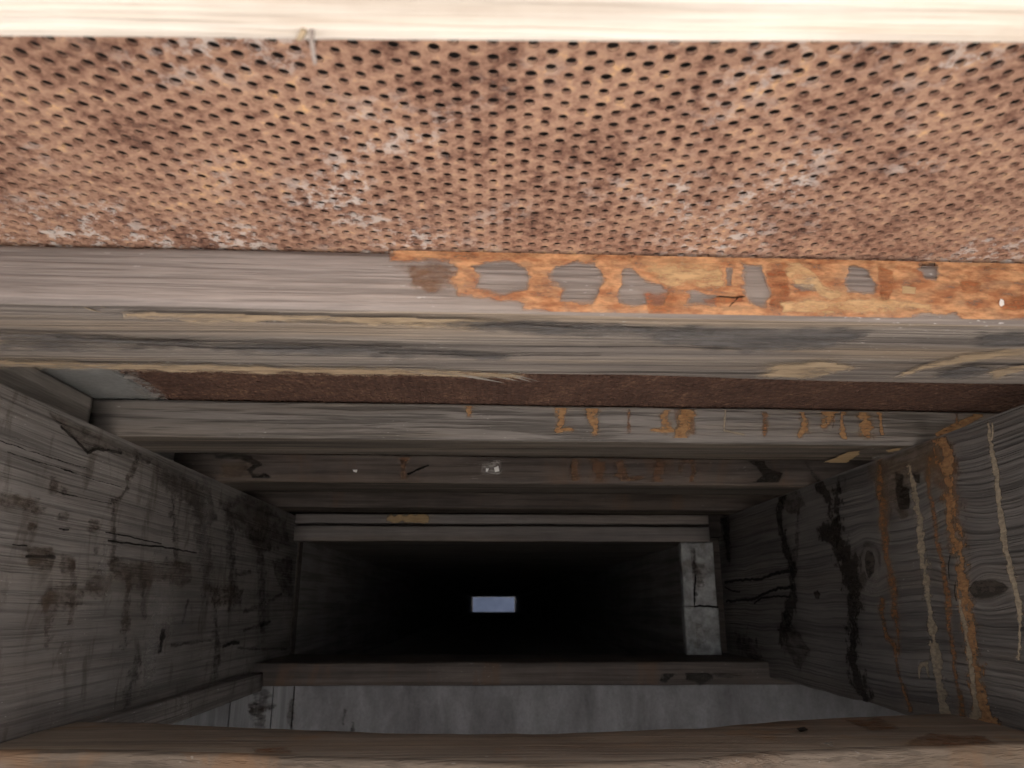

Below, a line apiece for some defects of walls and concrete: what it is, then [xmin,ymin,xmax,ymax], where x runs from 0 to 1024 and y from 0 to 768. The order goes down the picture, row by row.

rust [390,250,1024,320]
rust [554,408,574,433]
rust [650,409,696,438]
rust [797,411,884,440]
leakage [52,415,150,513]
leakage [26,547,75,573]
crack [105,532,197,554]
leakage [42,473,292,704]
crack [694,568,794,608]
leakage [776,491,809,668]
leakage [808,466,874,702]
rust [931,413,1002,725]